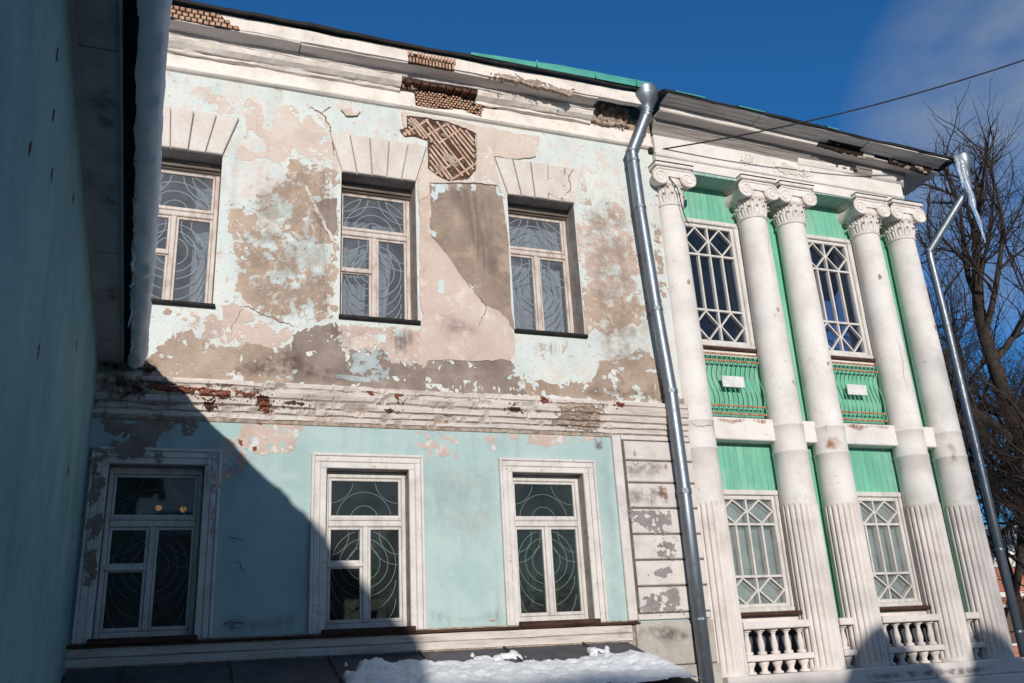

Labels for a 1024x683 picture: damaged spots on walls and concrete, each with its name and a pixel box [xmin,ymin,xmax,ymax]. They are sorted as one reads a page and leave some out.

crack [309,106,337,158]
spalling [489,72,575,98]
crack [299,179,339,246]
peeling [162,81,630,452]
spalling [136,379,305,480]
peeling [412,430,459,462]
peeling [80,418,199,585]
peeling [622,504,685,616]